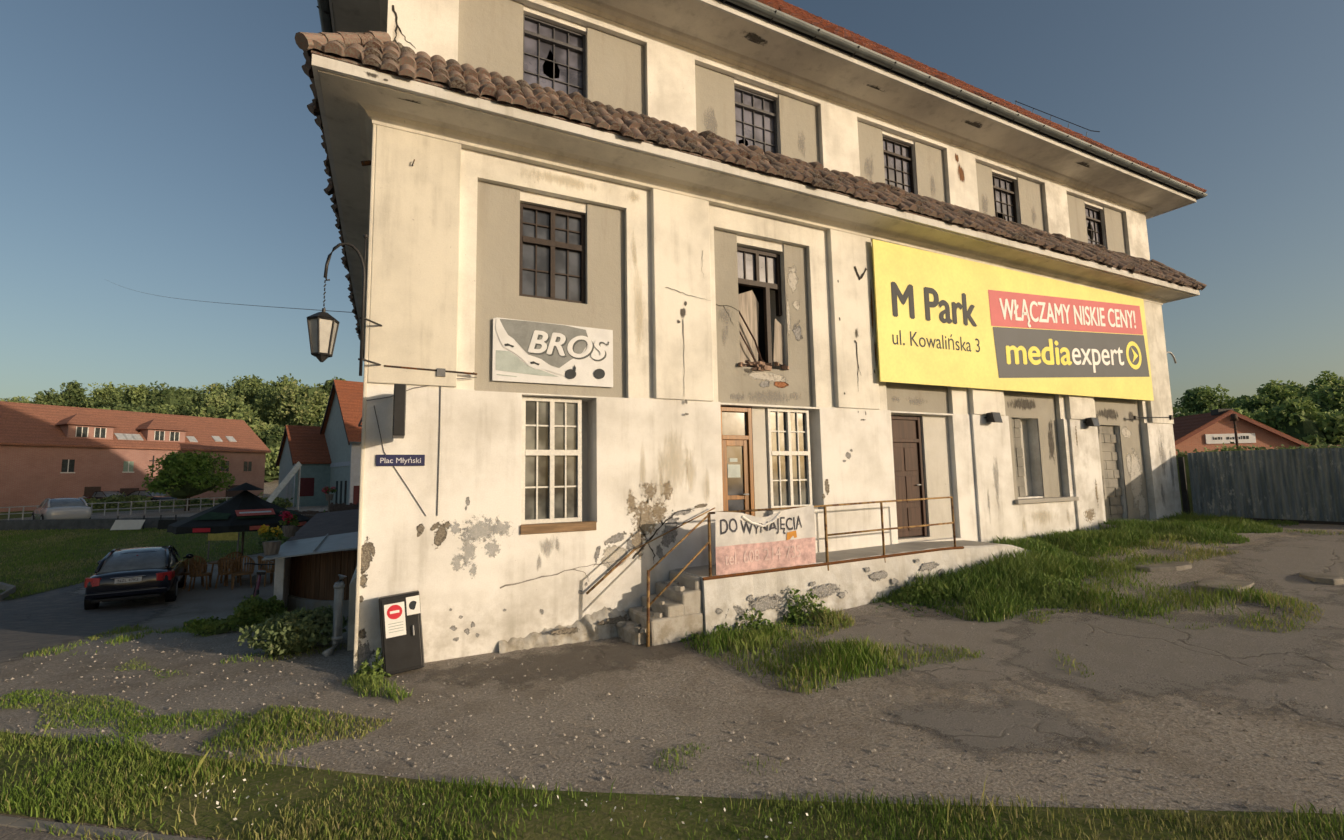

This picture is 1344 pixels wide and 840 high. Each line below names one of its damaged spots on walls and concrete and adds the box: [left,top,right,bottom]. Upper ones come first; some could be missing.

flaking render [360,537,375,603]
peeling [417,497,510,575]
crack [500,508,695,589]
peeling [594,531,634,571]
spalling [656,504,708,558]
flaking render [354,619,376,672]